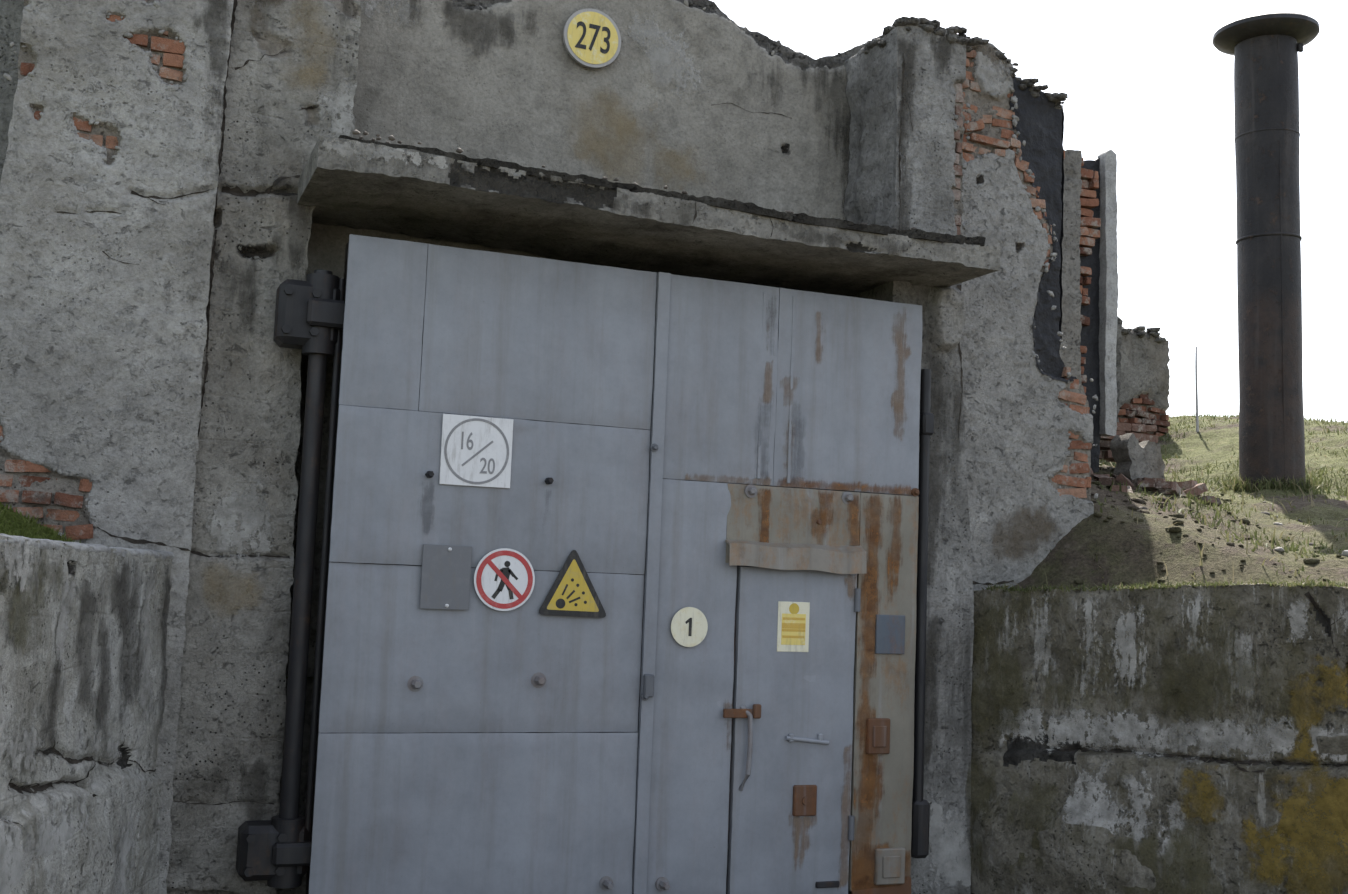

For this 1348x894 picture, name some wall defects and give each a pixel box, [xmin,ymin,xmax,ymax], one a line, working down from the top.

spalling [106,13,192,92]
flaking render [861,16,1101,417]
spalling [1048,393,1170,506]
spalling [0,460,98,540]
damp [4,540,30,592]
damp [6,577,96,774]
damp [82,562,171,767]
rust [758,478,912,813]
crack [1304,592,1341,657]
crack [0,738,156,827]
crack [174,799,274,807]
crack [1053,738,1348,773]